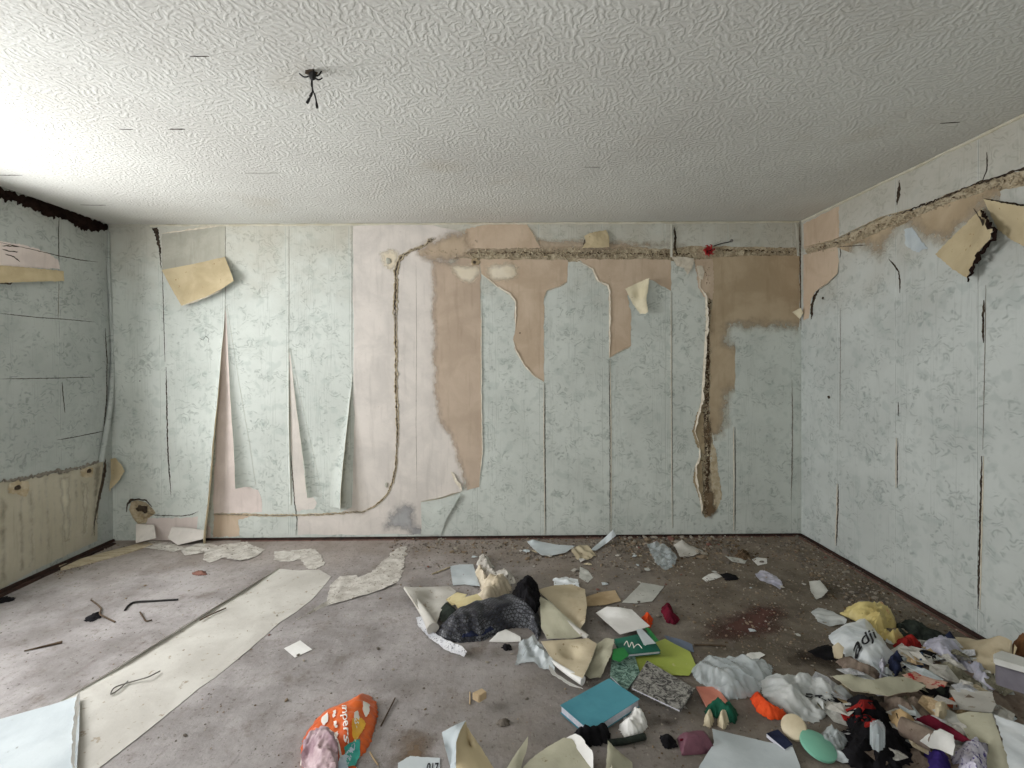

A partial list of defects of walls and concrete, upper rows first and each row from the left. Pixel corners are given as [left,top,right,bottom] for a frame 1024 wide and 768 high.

flaking render [0,241,60,269]
flaking render [161,225,225,272]
flaking render [126,311,262,540]
flaking render [289,174,1023,535]